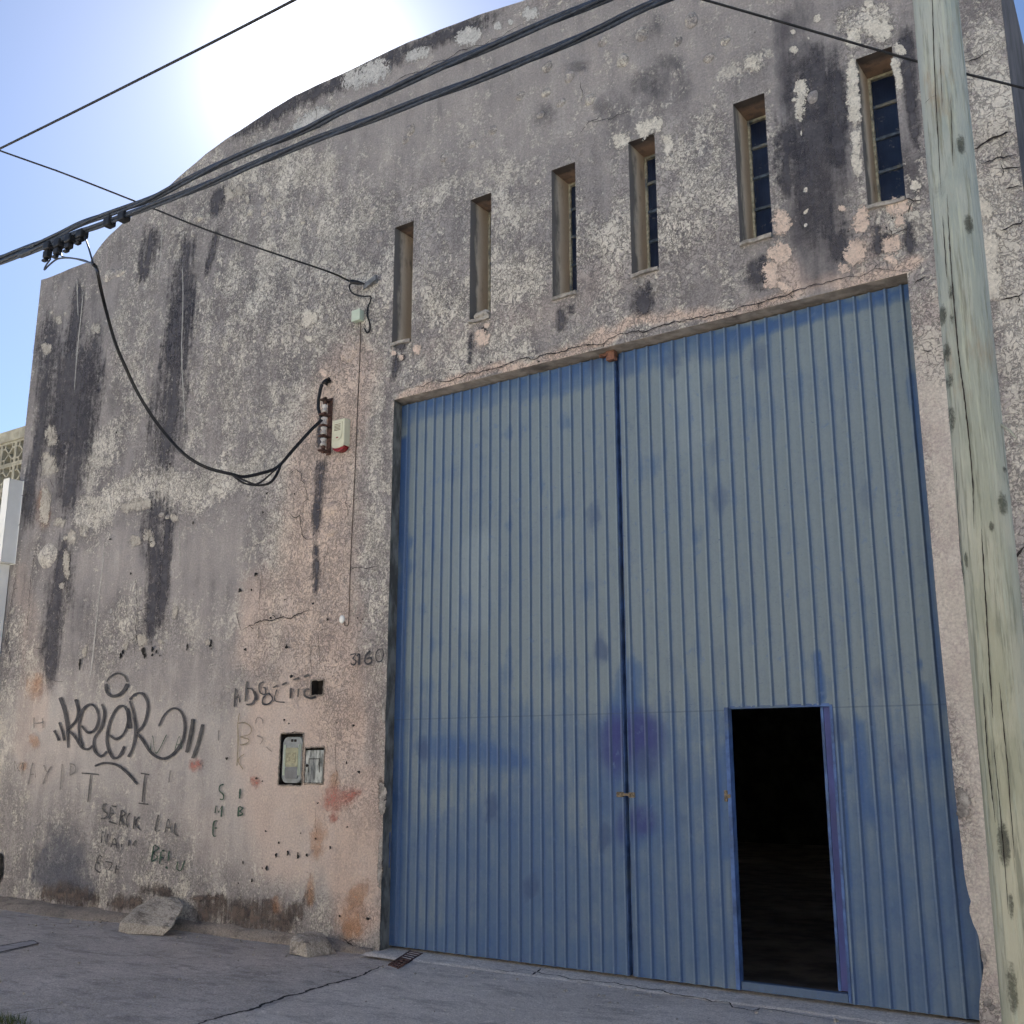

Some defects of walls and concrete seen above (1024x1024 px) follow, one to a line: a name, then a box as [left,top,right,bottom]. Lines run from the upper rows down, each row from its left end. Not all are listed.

peeling [761,207,808,294]
peeling [791,78,809,136]
leakage [776,46,848,261]
peeling [837,204,870,275]
peeling [844,0,906,177]
peeling [881,180,921,266]
leakage [40,540,73,684]
leakage [22,284,105,526]
leakage [140,497,180,638]
leakage [147,231,219,472]
leakage [312,461,325,593]
crack [394,0,1019,914]